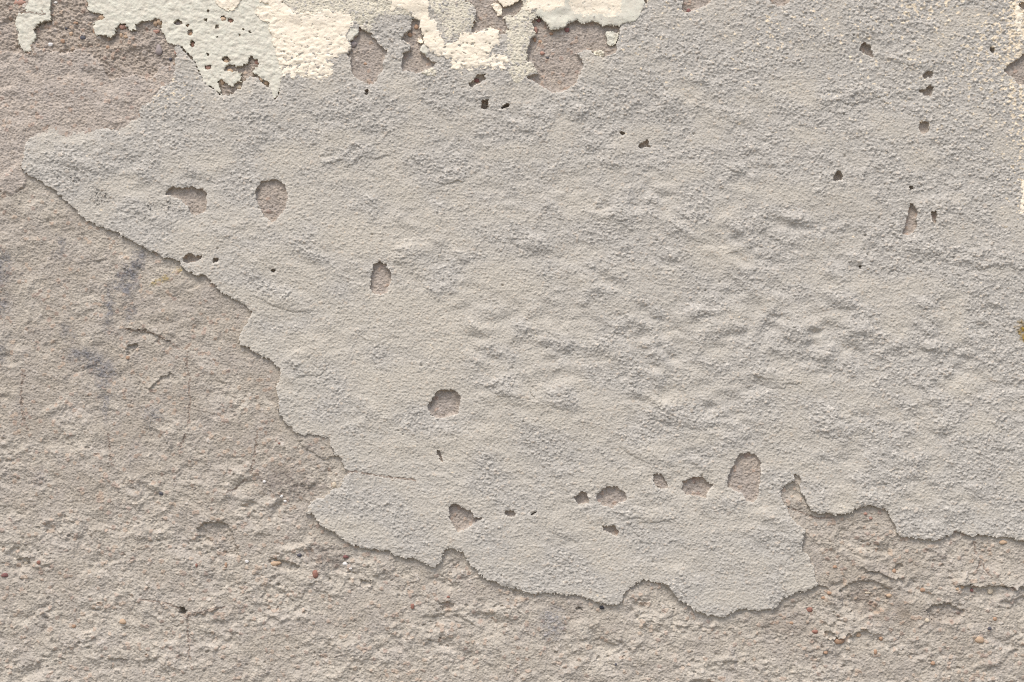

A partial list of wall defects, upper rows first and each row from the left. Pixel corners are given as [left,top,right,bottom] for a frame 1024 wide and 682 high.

spalling [0,0,647,195]
spalling [0,177,1024,682]